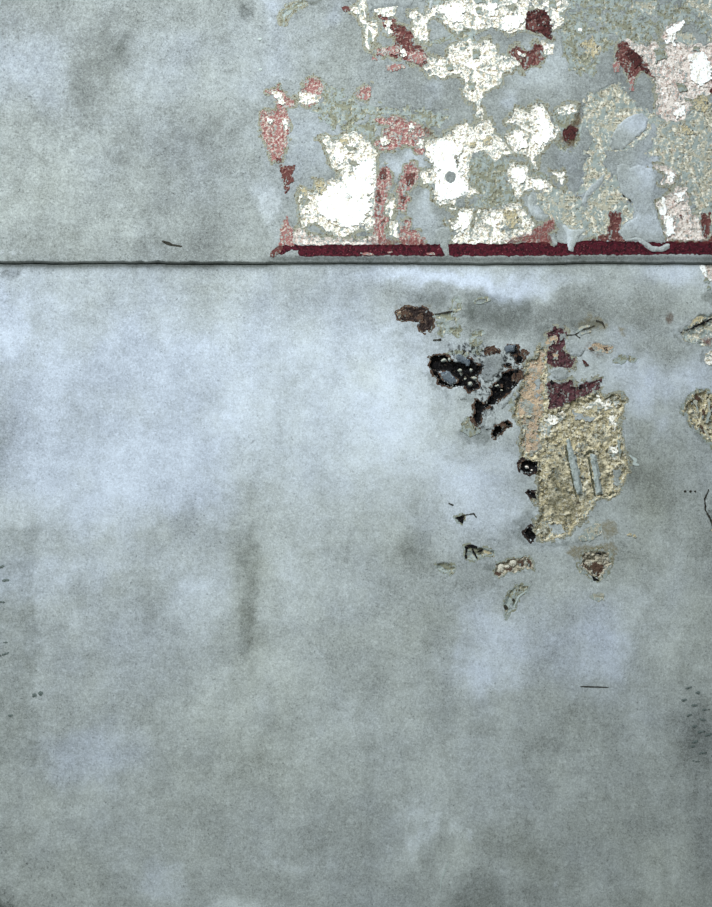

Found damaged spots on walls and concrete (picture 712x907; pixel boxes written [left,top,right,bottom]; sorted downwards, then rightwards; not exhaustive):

flaking render [276,0,308,27]
flaking render [341,0,586,256]
flaking render [609,17,712,151]
flaking render [278,131,400,246]
flaking render [617,161,705,252]
flaking render [427,296,639,602]
flaking render [679,387,712,450]
flaking render [434,543,536,621]